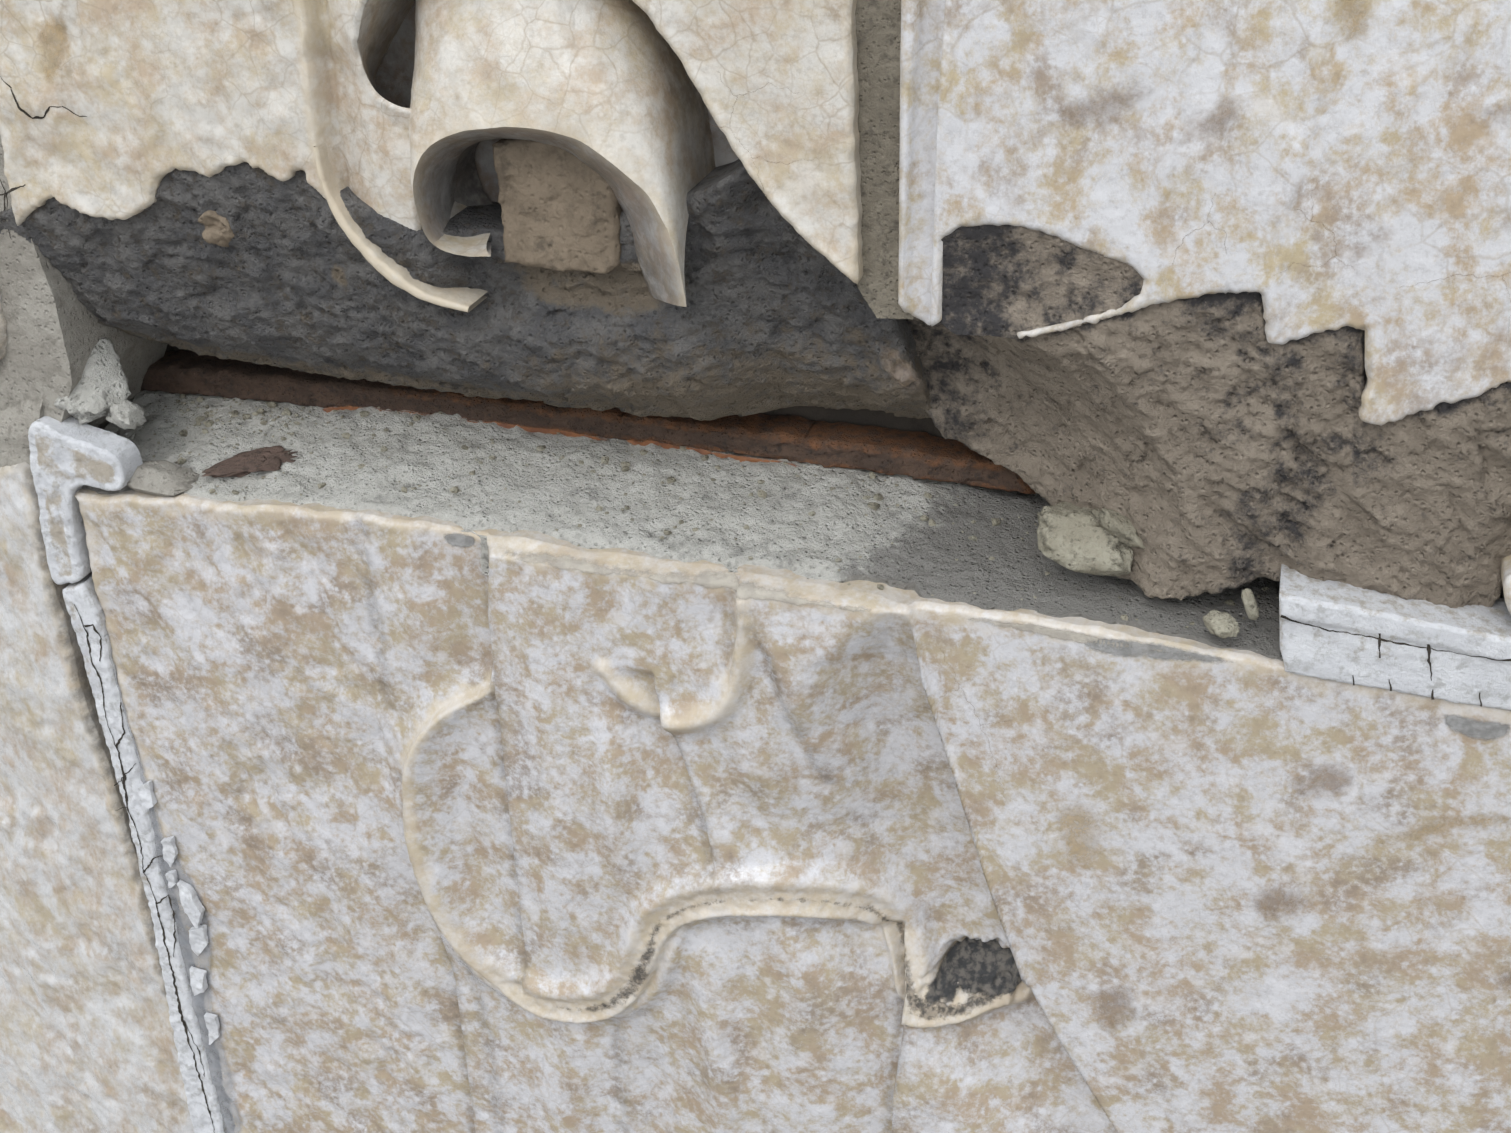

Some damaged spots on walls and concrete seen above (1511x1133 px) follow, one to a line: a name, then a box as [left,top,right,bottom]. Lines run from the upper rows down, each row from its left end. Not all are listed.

crack [0,76,87,119]
crack [0,180,25,238]
spalling [0,159,1511,608]
rust [466,419,606,441]
rust [627,439,797,467]
crack [1280,615,1511,707]
crack [74,604,214,1128]